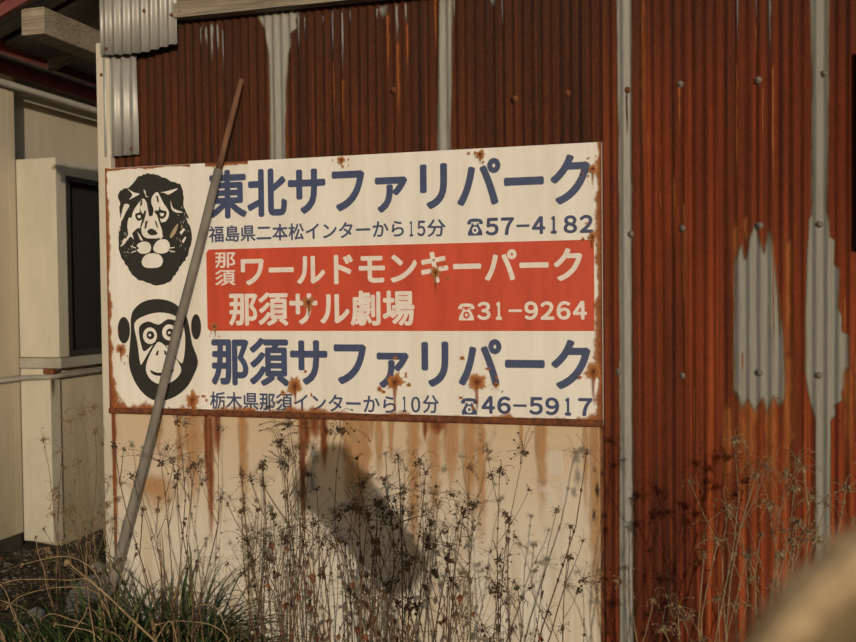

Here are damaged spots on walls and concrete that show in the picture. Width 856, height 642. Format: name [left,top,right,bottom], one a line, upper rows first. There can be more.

corrosion [386,14,409,110]
corrosion [762,67,774,179]
corrosion [577,142,603,420]
peeling [734,223,785,413]
corrosion [181,390,255,526]
corrosion [272,370,353,513]
corrosion [377,372,411,415]
corrosion [423,423,448,438]
corrosion [469,368,503,410]
corrosion [536,425,547,489]
corrosion [723,240,795,512]
corrosion [844,354,856,461]